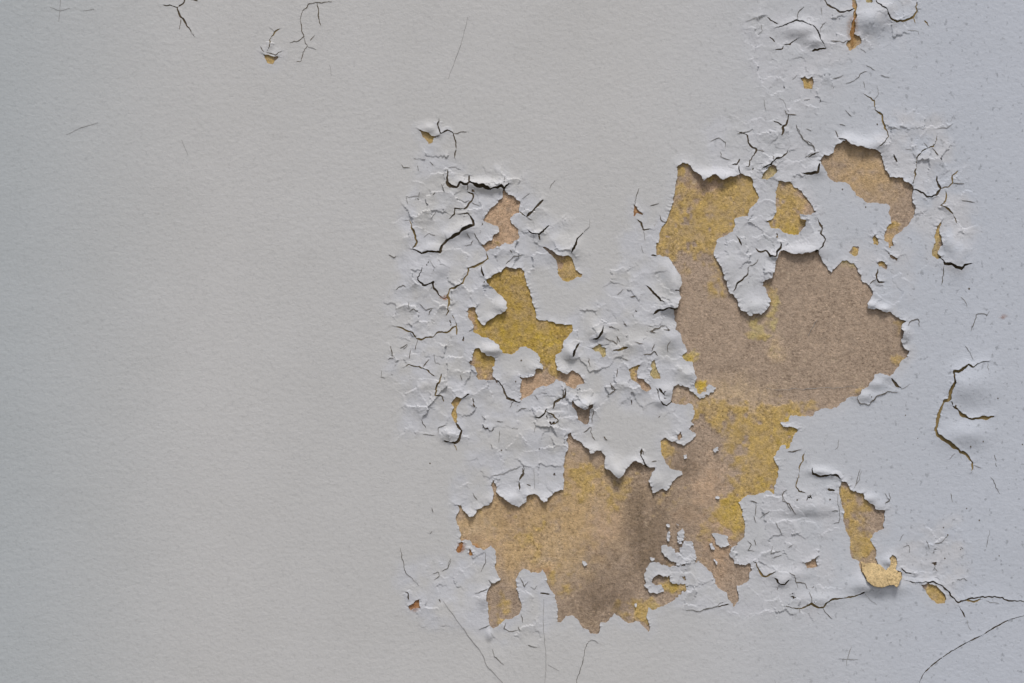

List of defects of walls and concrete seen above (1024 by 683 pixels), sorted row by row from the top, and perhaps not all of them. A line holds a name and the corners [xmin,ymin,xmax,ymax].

crack [164,0,198,36]
crack [260,1,331,70]
peeling [419,121,440,144]
peeling [815,113,916,269]
peeling [932,222,943,259]
peeling [439,397,463,442]
peeling [456,160,909,634]
crack [934,256,1000,494]
peeling [921,583,946,604]
crack [900,534,1024,678]